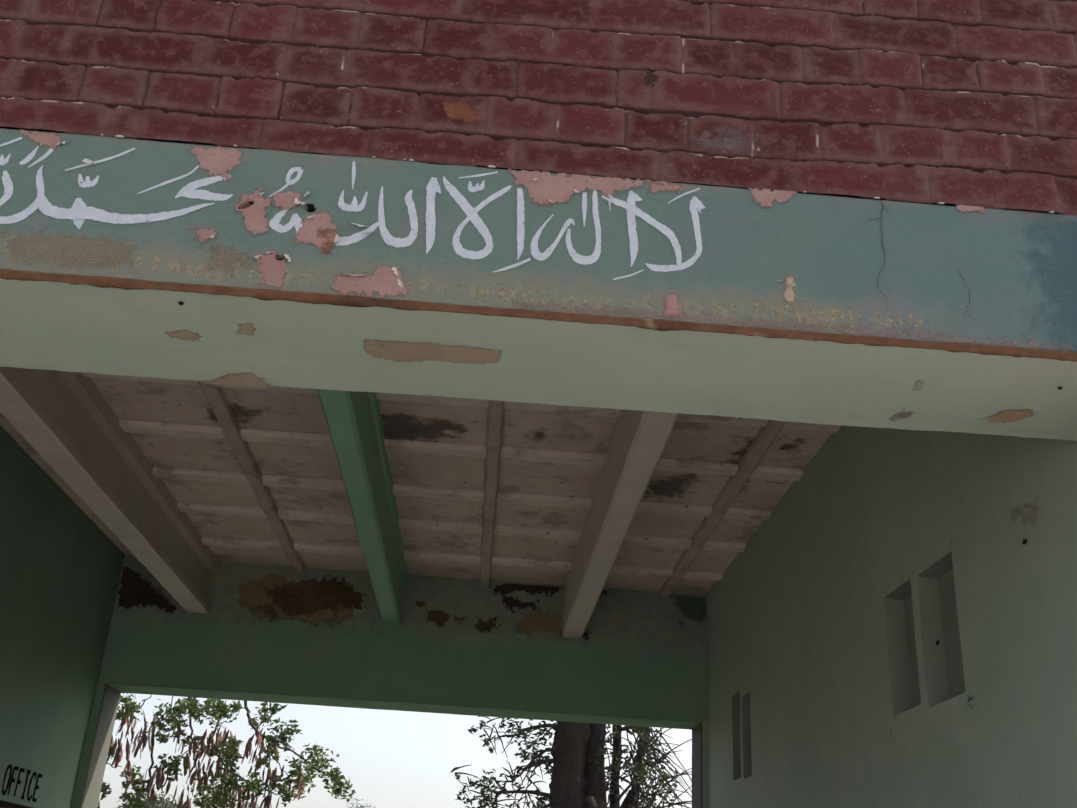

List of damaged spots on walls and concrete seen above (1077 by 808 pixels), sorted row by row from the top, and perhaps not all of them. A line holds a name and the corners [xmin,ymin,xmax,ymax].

peeling [20,129,66,150]
peeling [188,144,243,181]
peeling [508,168,684,207]
crack [864,199,892,310]
spalling [0,186,1077,364]
water stain [381,414,468,442]
peeling [988,410,1037,423]